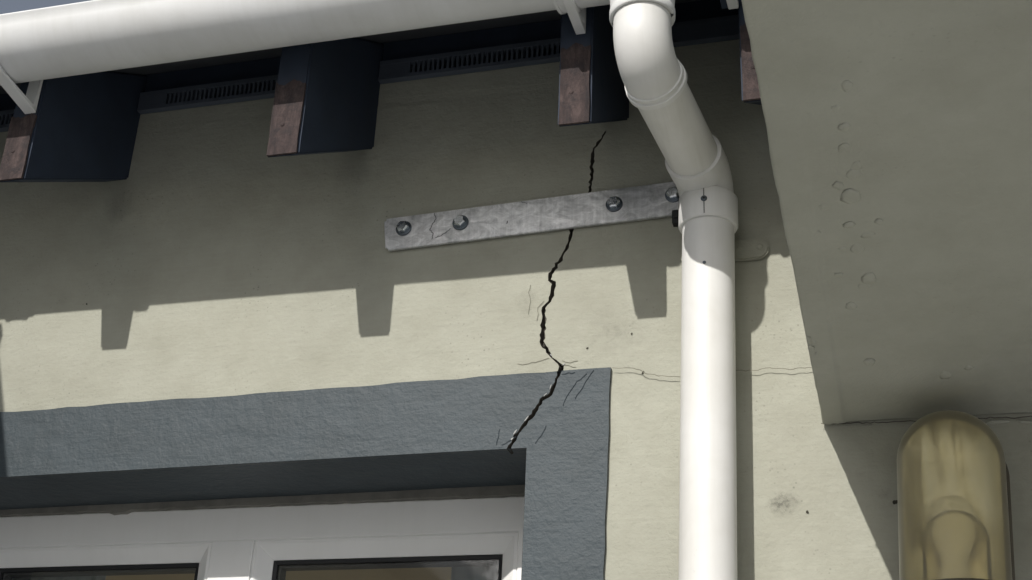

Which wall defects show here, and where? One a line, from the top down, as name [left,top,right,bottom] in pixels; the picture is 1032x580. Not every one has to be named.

crack [588,131,606,193]
crack [496,229,680,454]
crack [736,365,812,373]